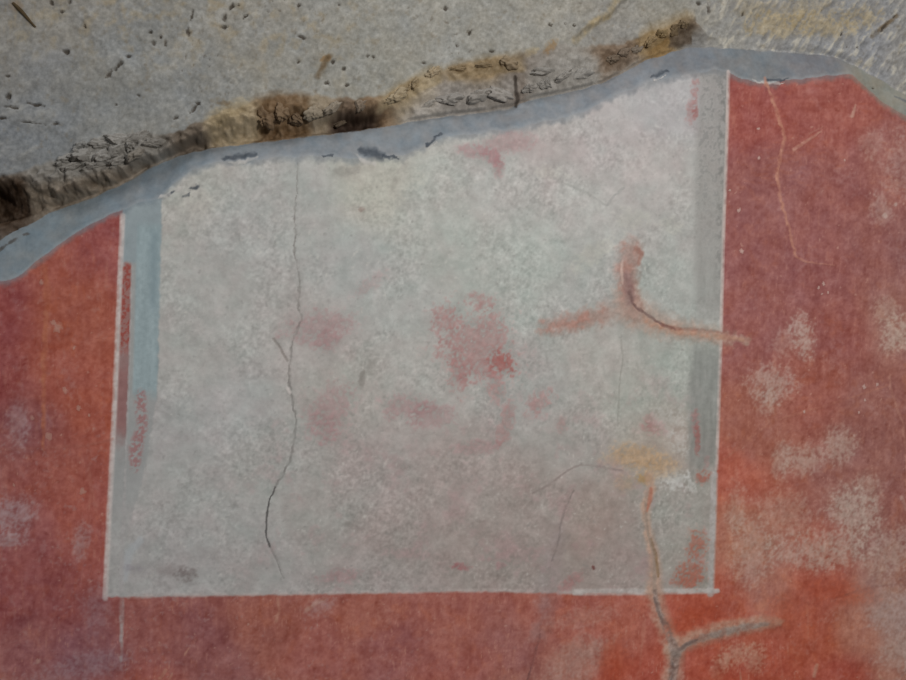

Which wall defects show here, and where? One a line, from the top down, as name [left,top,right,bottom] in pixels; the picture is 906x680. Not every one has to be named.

spalling [0,93,60,126]
spalling [24,129,166,218]
spalling [105,55,131,80]
spalling [173,1,711,166]
crack [761,76,835,266]
crack [264,162,304,579]
crack [530,229,753,427]
crack [532,462,768,680]